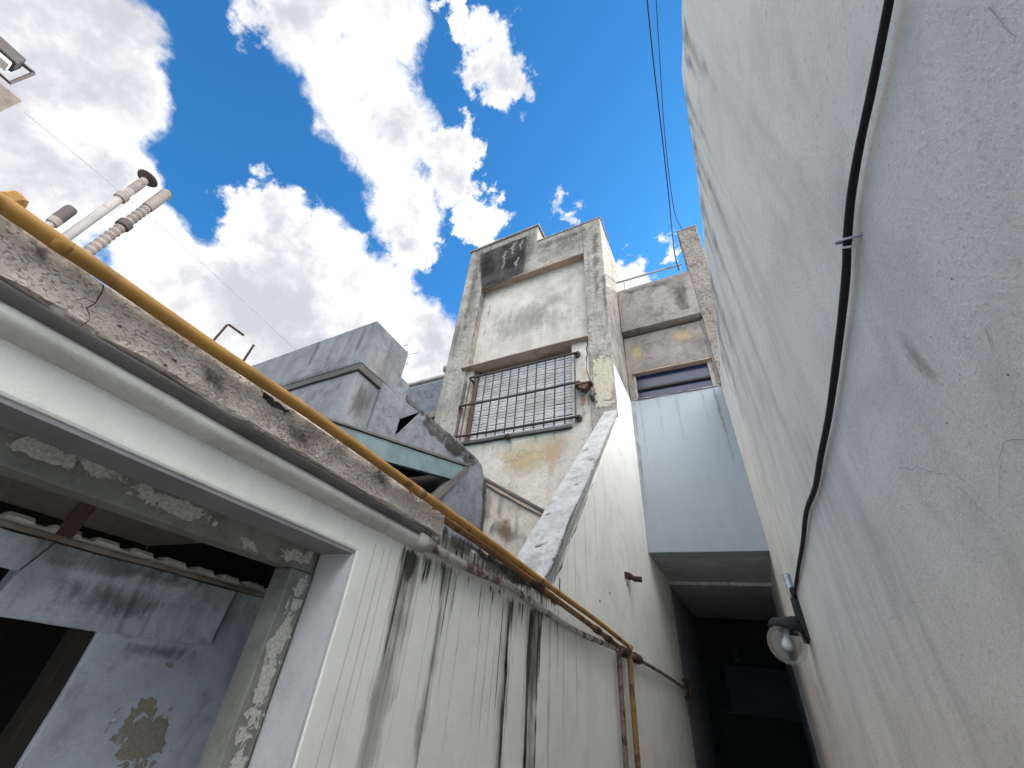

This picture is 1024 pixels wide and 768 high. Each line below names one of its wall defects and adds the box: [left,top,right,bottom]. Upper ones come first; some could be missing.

crack [74,285,104,326]
water stain [468,236,527,309]
spalling [261,389,293,414]
flaking render [593,351,615,408]
peeling [4,434,218,526]
water stain [480,480,511,538]
peeling [229,548,313,768]
water stain [383,525,560,768]
peeling [105,693,172,768]